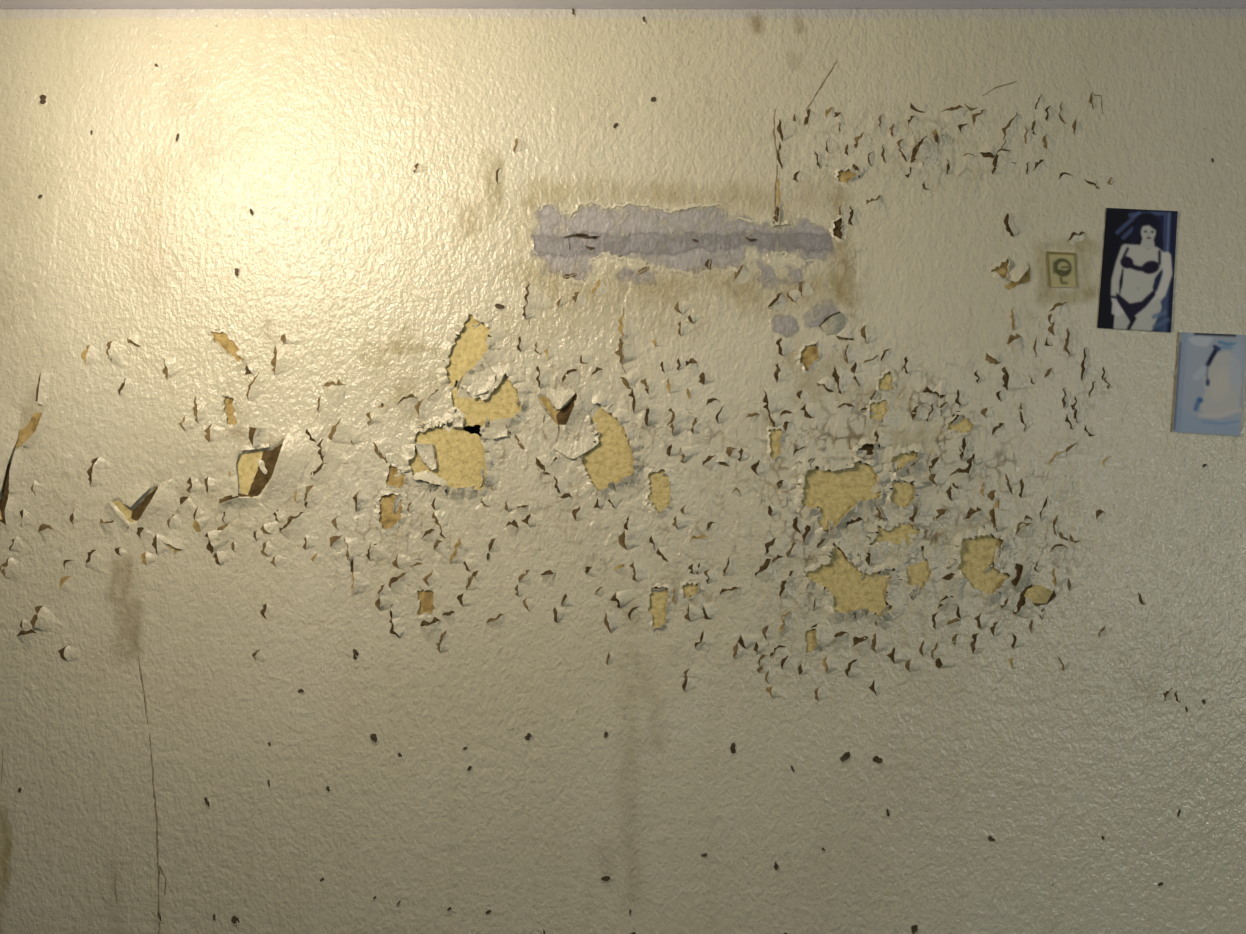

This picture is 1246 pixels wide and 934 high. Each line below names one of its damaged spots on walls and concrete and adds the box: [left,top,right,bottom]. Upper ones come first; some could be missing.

peeling [413,163,429,173]
peeling [513,138,528,153]
peeling [737,94,1116,228]
peeling [810,195,888,243]
peeling [1004,213,1032,237]
peeling [522,252,649,320]
peeling [768,281,816,313]
peeling [987,256,1030,290]
peeling [0,369,53,579]
peeling [59,301,1116,702]
peeling [16,606,81,662]
crack [138,656,167,934]